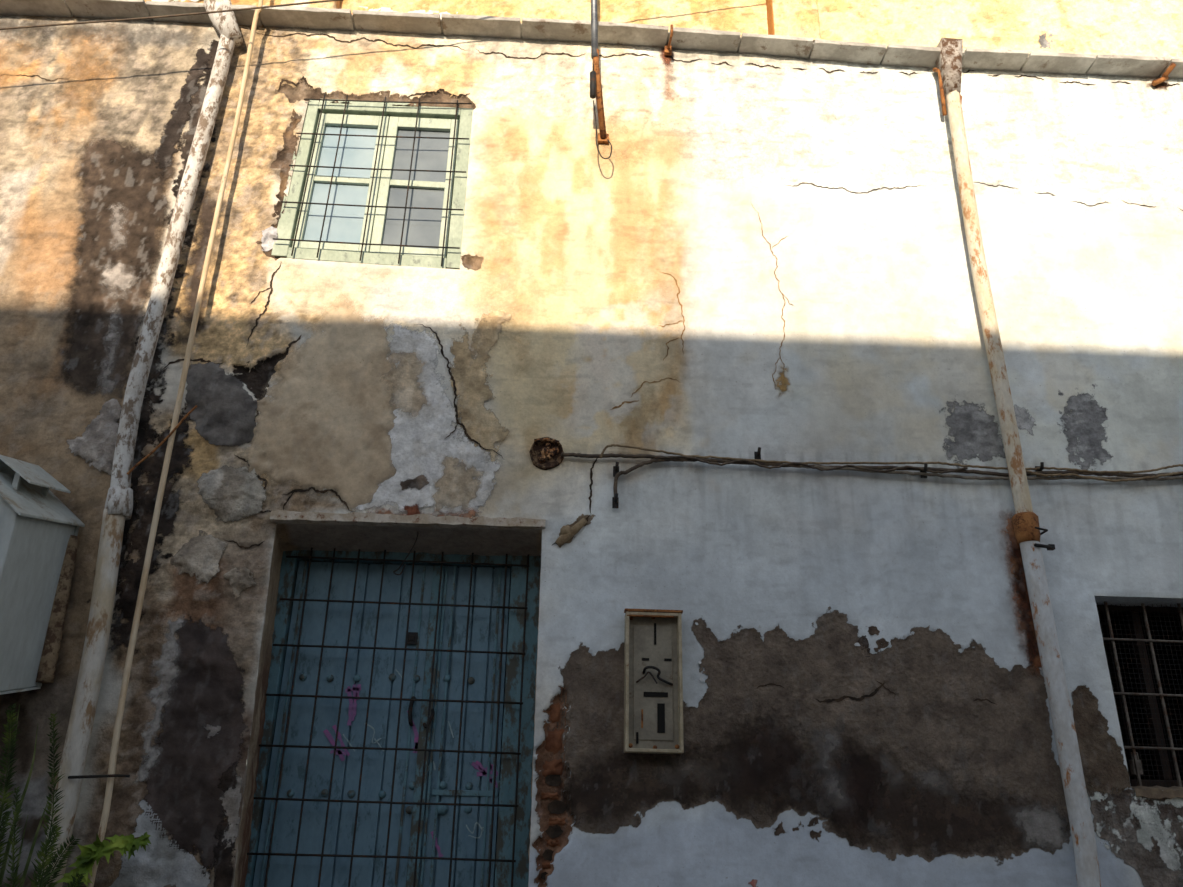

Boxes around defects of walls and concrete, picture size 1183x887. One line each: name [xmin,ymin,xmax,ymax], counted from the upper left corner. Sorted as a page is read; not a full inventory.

crack [256,32,917,75]
damp [59,40,219,398]
damp [109,163,225,654]
crack [163,264,281,369]
peeling [356,323,501,517]
crack [417,324,503,458]
crack [751,203,793,396]
peeling [1057,384,1113,470]
corrosion [1004,514,1042,674]
damp [141,615,247,887]
flaking render [541,606,1071,880]
flaking render [1072,685,1183,887]